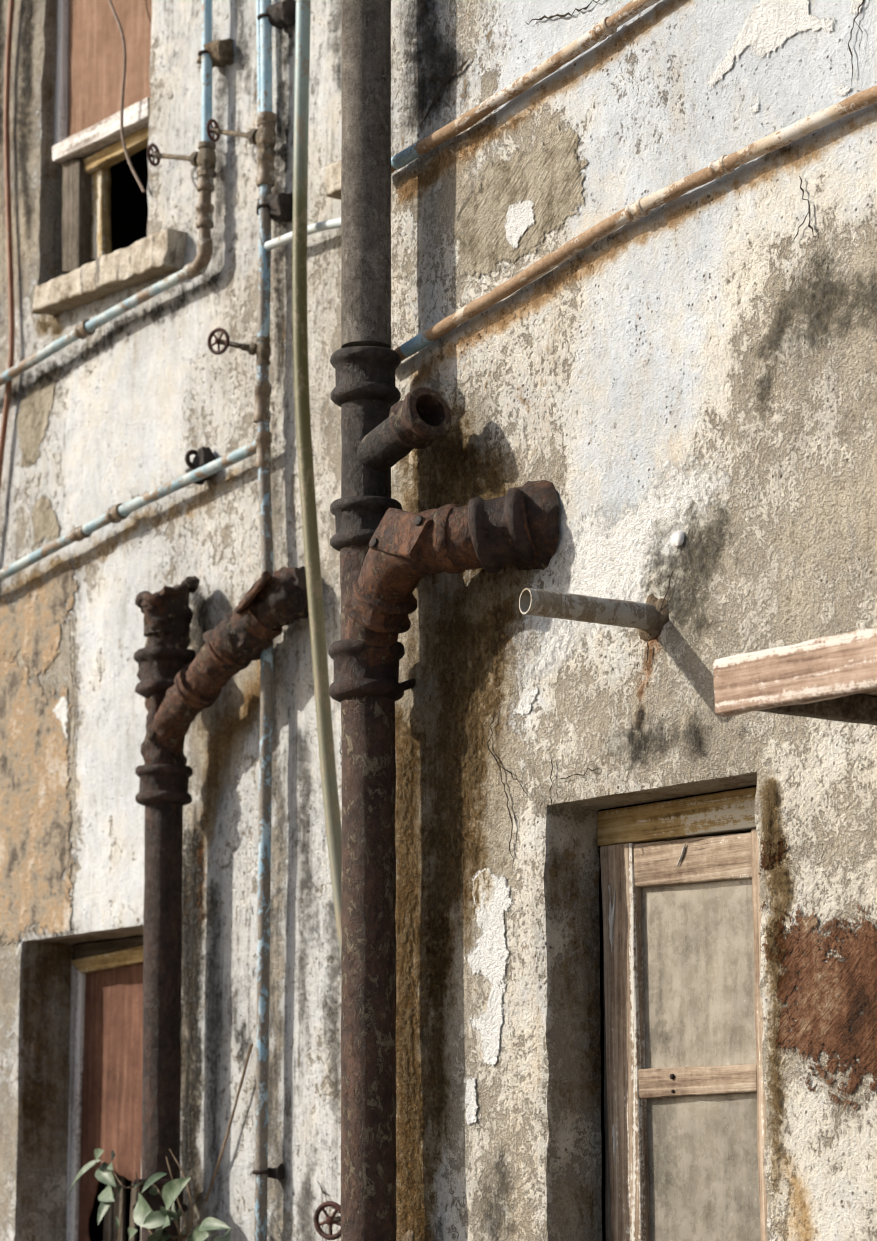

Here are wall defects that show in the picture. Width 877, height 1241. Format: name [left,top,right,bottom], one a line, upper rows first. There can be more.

leakage [405,0,460,126]
crack [525,0,600,25]
peeling [706,0,835,88]
peeling [849,0,863,14]
crack [848,0,864,85]
spalling [451,124,588,279]
crack [794,176,815,239]
leakage [624,708,661,761]
leakage [395,597,521,1241]
peeling [463,868,513,1067]
leakage [760,778,789,1169]
peeling [464,1076,478,1125]